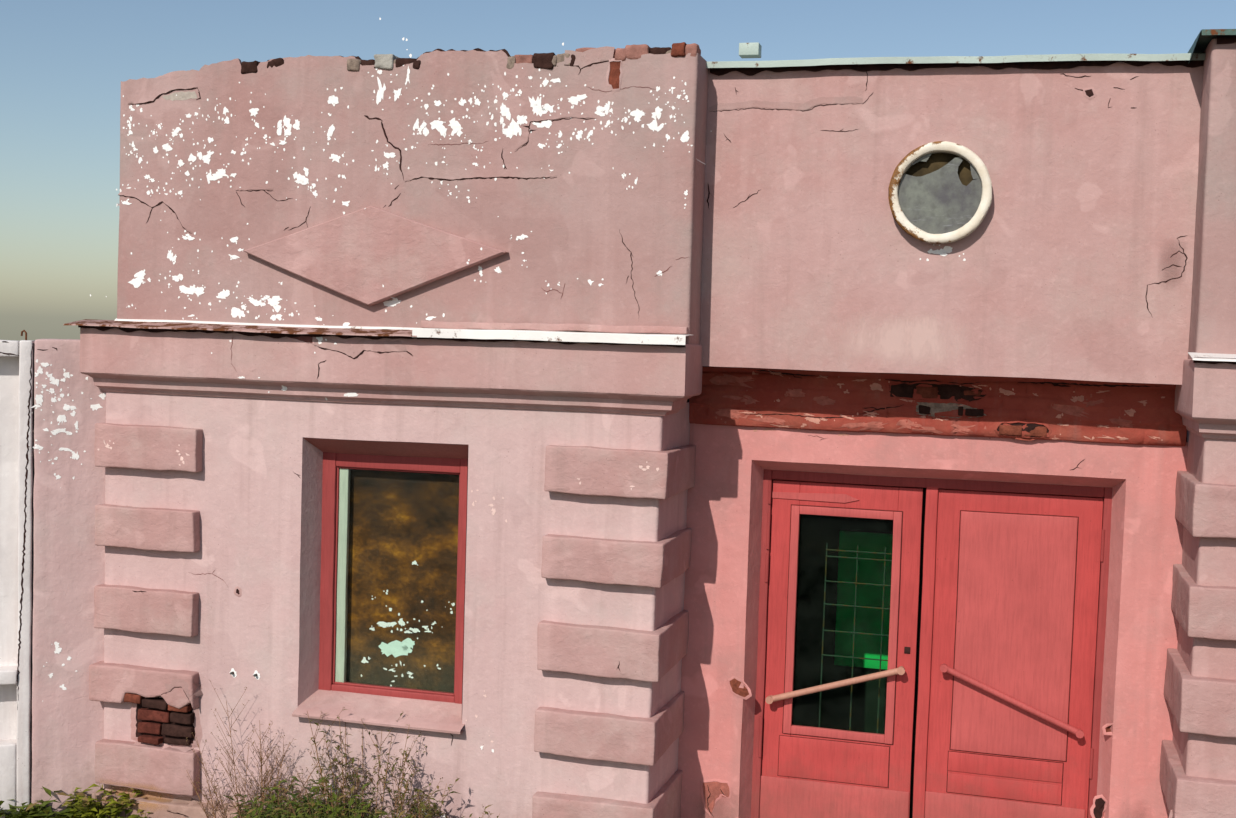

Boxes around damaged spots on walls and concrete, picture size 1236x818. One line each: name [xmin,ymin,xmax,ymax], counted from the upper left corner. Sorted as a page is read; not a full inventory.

crack [128,69,206,105]
peeling [116,87,354,214]
crack [364,46,652,208]
peeling [368,38,706,184]
crack [118,185,195,233]
peeling [128,211,300,321]
crack [620,233,688,315]
crack [1146,235,1188,315]
flaking render [286,305,350,354]
crack [314,337,413,378]
flaking render [709,370,1165,440]
flaking render [124,693,203,752]